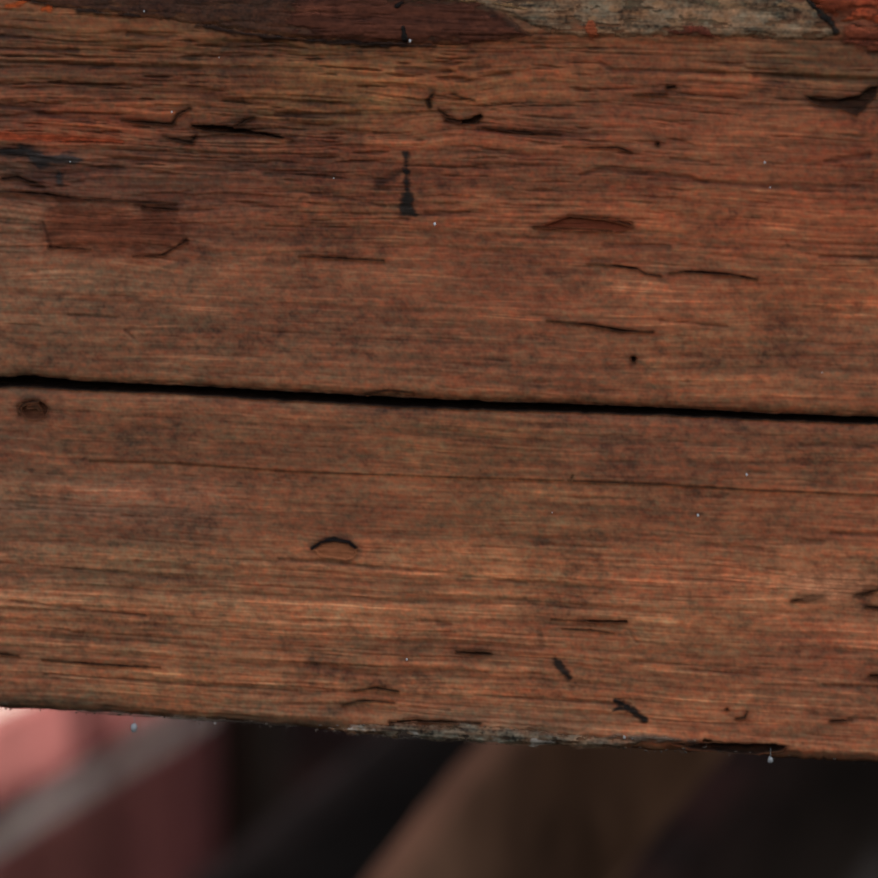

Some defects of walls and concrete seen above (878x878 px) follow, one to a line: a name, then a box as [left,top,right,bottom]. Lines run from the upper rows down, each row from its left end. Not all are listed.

peeling [26,0,840,47]
crack [0,373,878,426]